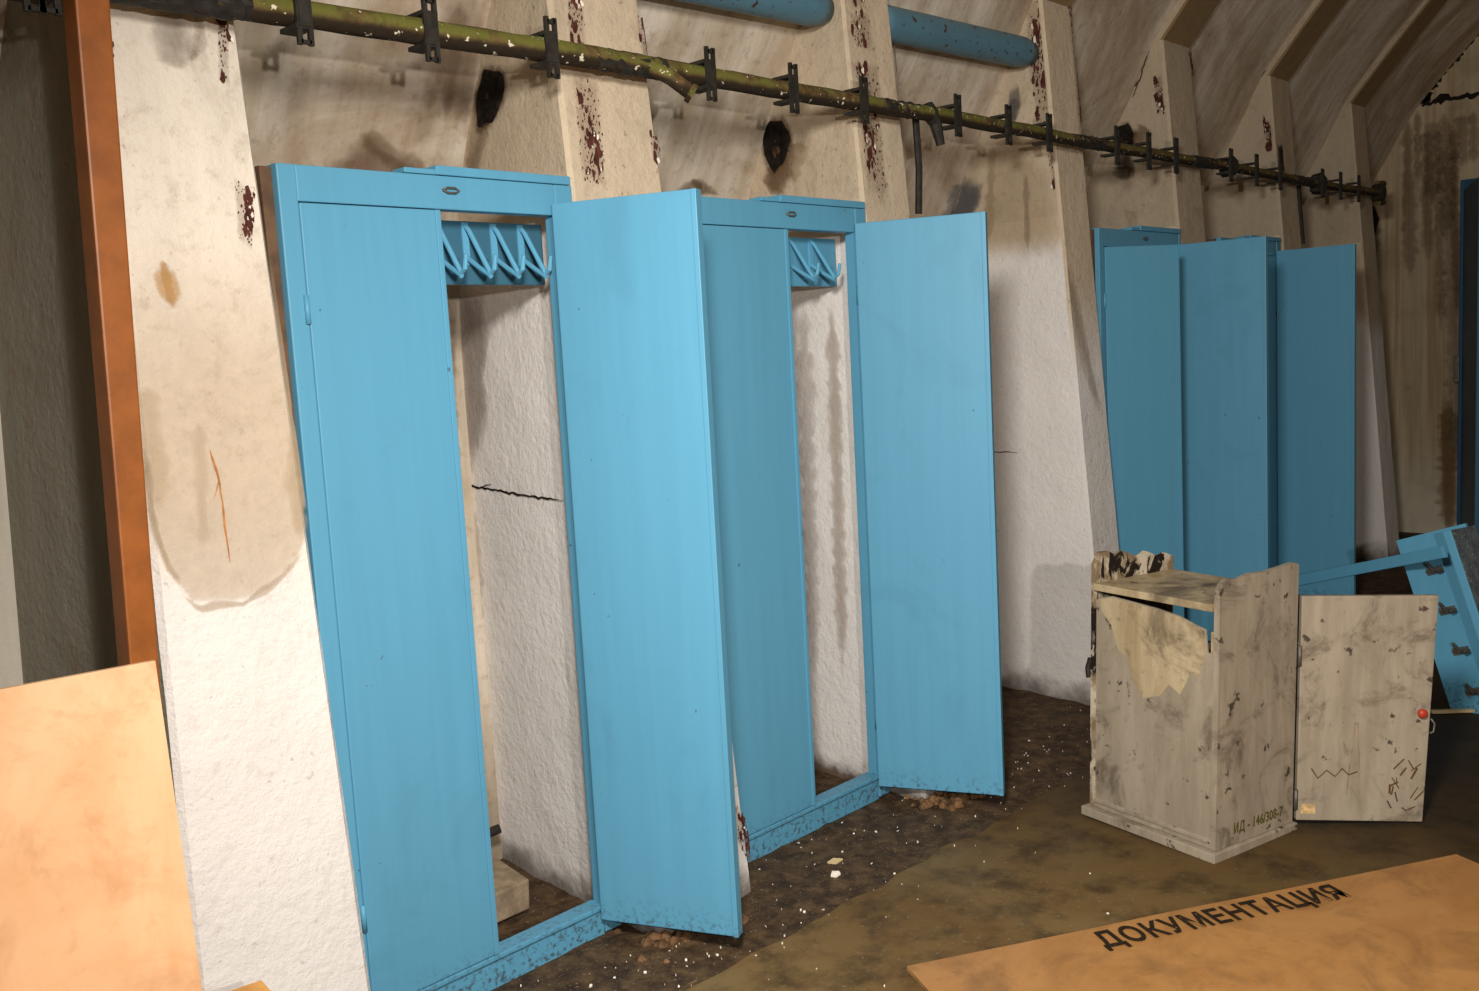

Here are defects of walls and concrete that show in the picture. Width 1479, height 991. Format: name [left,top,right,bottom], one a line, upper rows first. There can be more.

peeling [216,19,234,83]
peeling [235,181,255,245]
leakage [949,183,980,215]
crack [472,484,563,501]